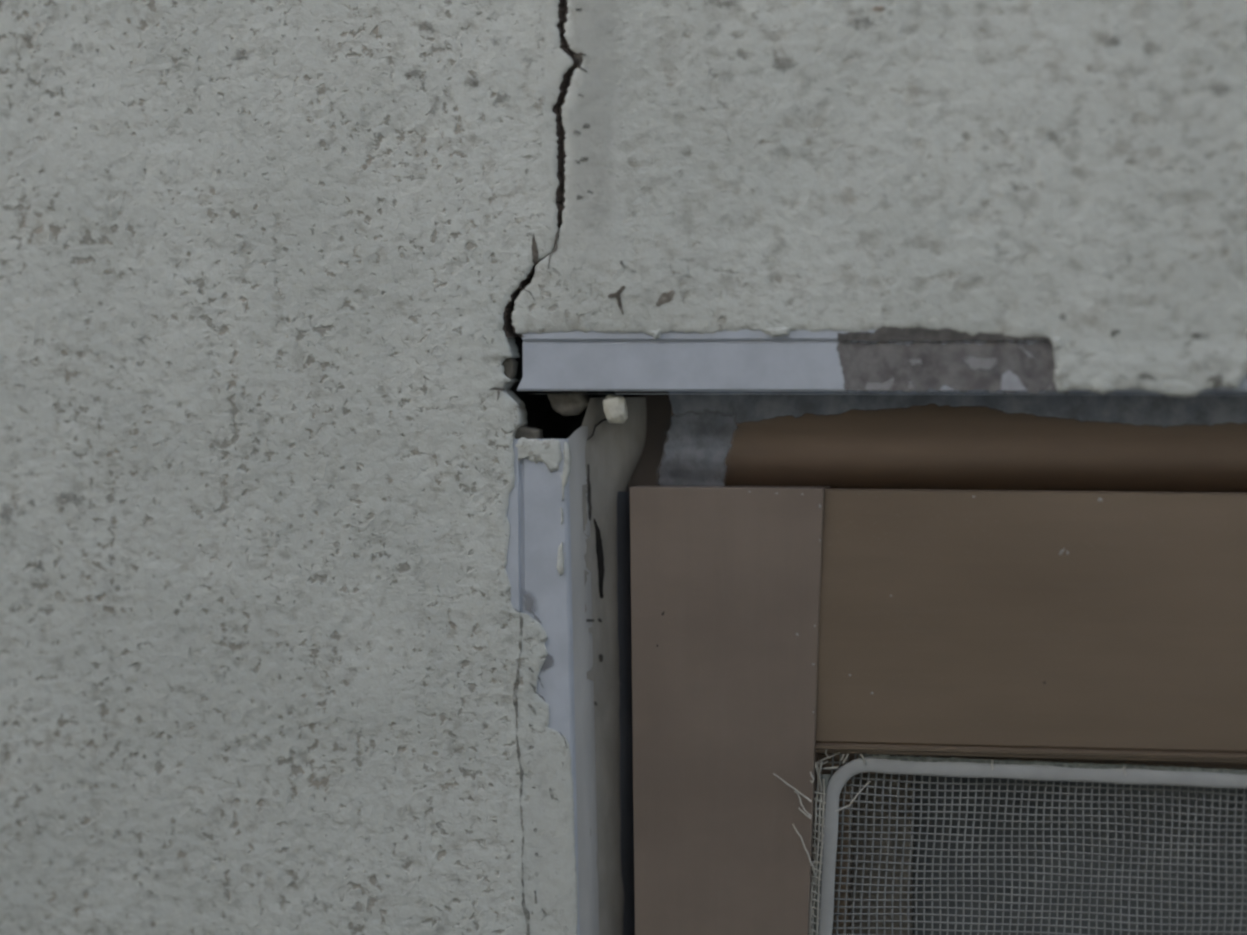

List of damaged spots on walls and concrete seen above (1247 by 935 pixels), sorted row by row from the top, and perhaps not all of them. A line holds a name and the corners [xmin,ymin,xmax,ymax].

crack [503,0,587,338]
flaking render [541,654,553,671]